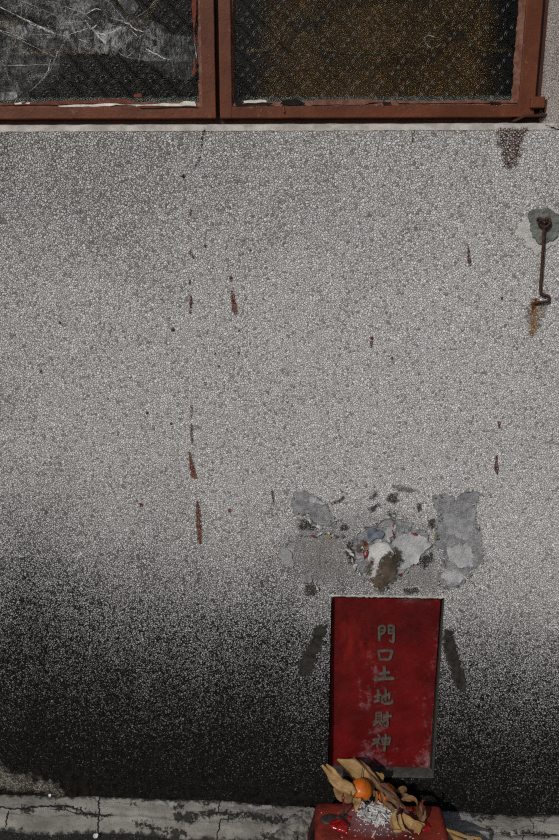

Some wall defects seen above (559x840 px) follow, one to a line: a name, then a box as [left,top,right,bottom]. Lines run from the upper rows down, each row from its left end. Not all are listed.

corrosion [527,298,546,338]
corrosion [188,405,197,479]
peeling [291,488,484,593]
crack [0,796,110,832]
crack [504,818,559,840]